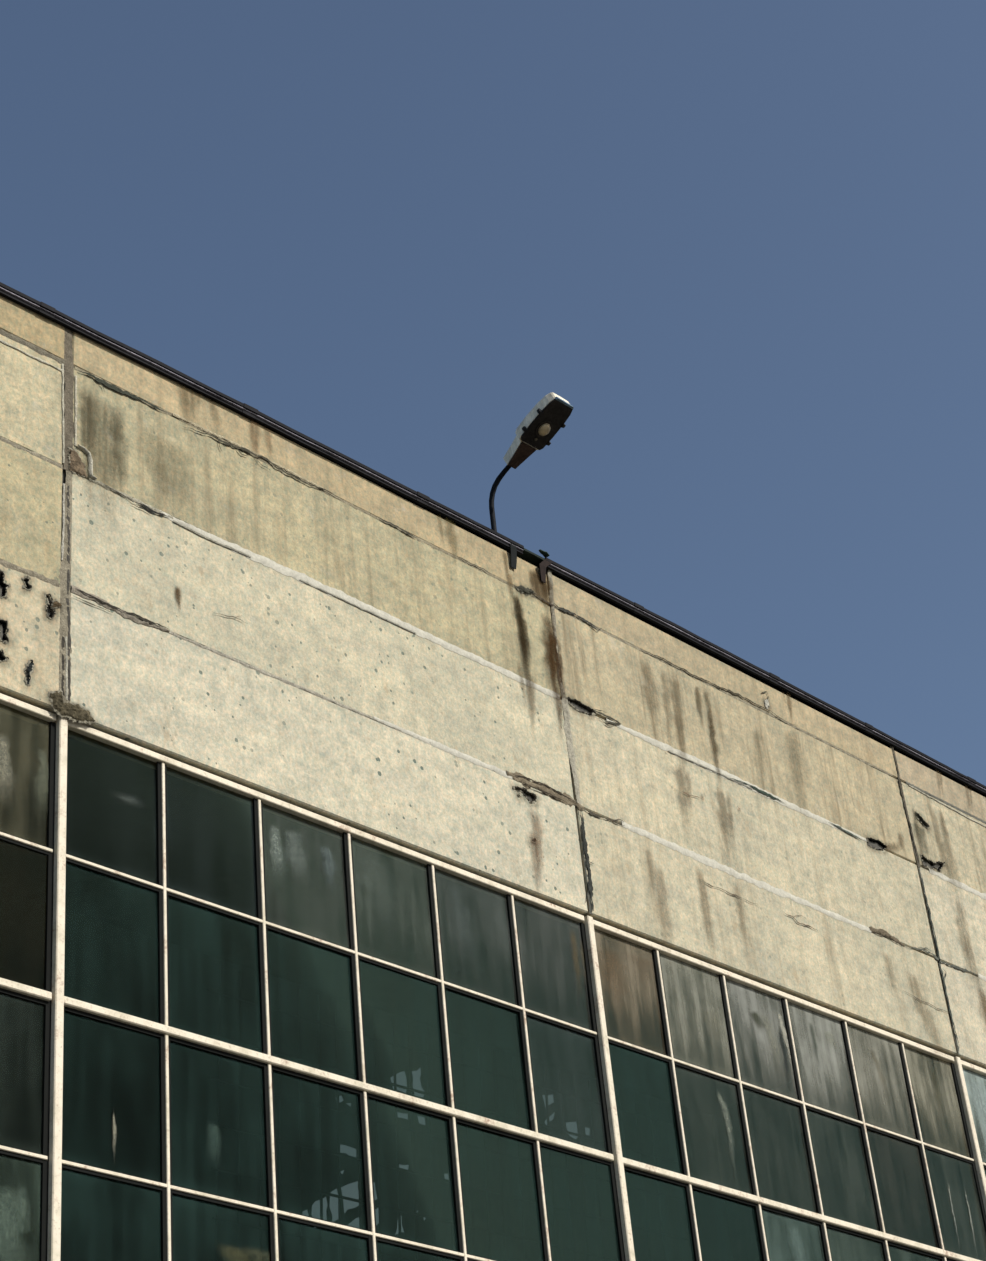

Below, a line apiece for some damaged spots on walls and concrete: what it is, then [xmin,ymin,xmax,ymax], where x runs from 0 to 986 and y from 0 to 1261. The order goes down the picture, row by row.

spalling [0,618,9,662]
spalling [24,659,35,686]
spalling [0,569,63,620]
corrosion [511,579,529,676]
corrosion [545,619,562,686]
crack [534,593,602,631]
spalling [566,696,597,716]
spalling [512,786,537,804]
spalling [921,854,945,871]
crack [872,749,979,1047]